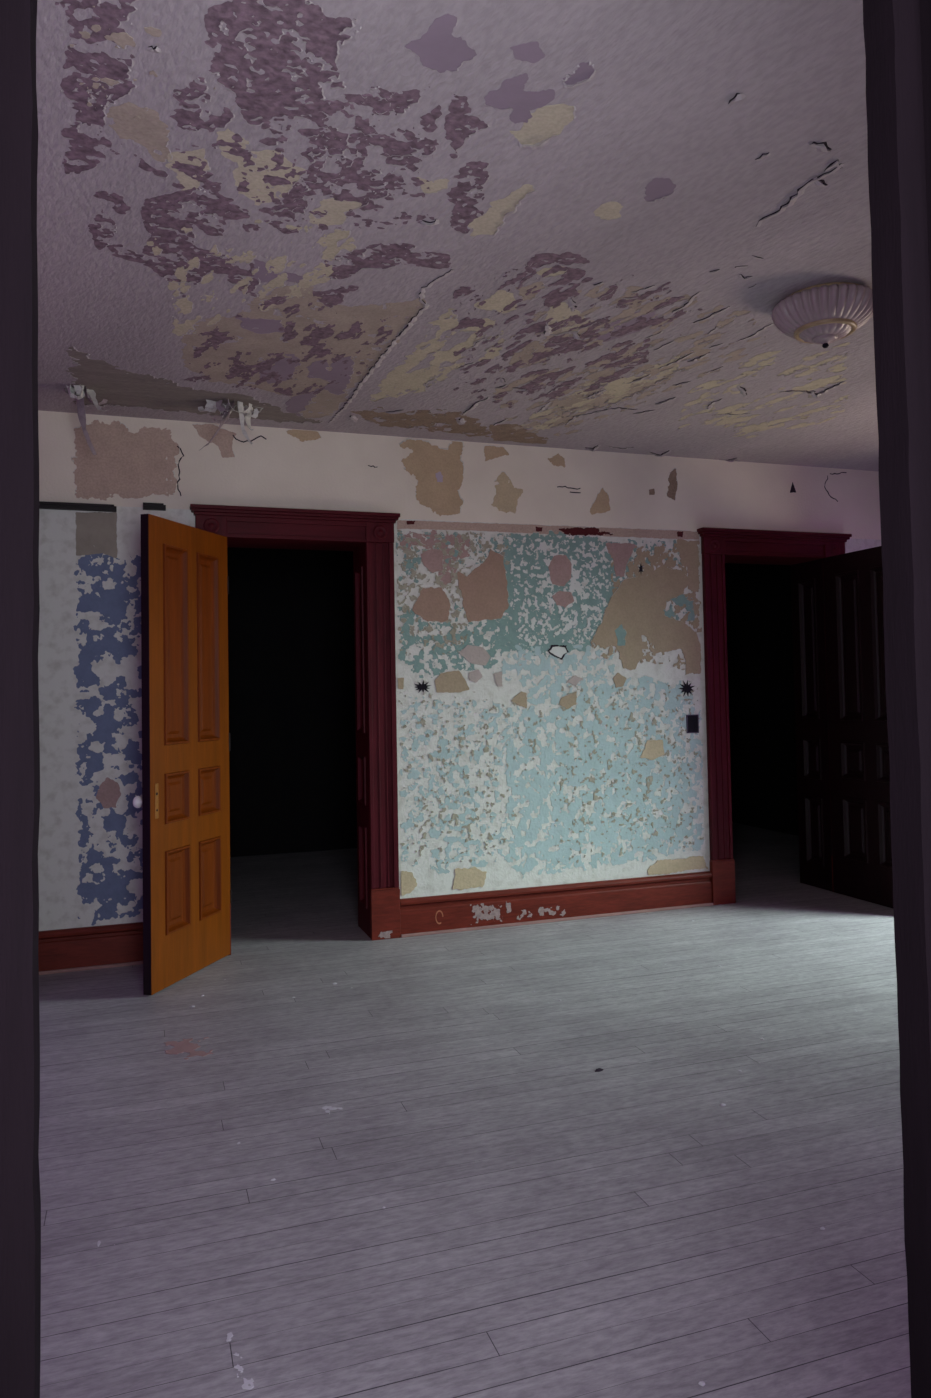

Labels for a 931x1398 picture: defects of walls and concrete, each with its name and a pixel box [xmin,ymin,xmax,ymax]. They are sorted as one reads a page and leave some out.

peeling [55,0,596,926]
peeling [349,252,774,925]
peeling [643,178,677,203]
crack [756,160,844,227]